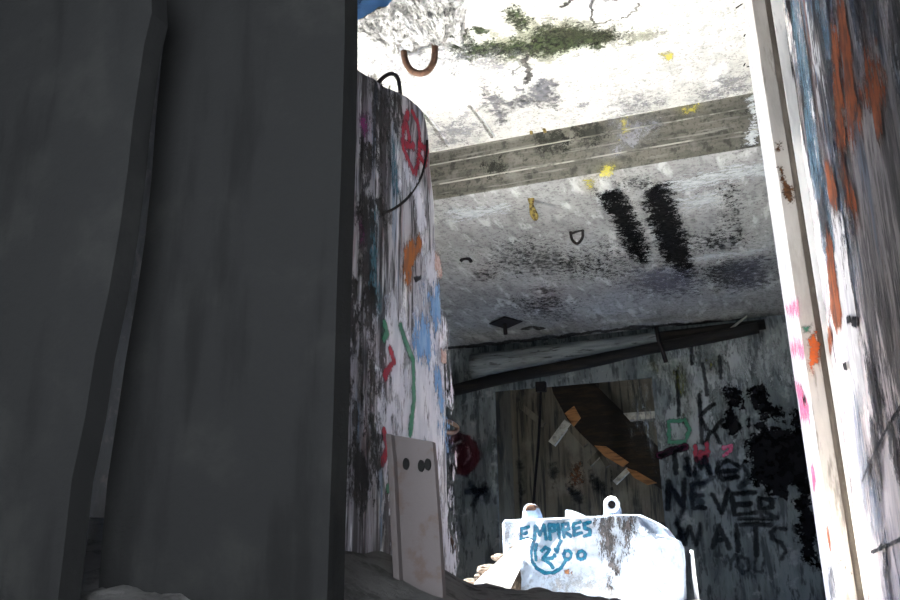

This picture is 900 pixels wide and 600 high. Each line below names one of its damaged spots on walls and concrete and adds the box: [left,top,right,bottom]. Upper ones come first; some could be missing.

spalling [358,0,471,57]
crack [559,0,640,26]
damp [532,93,665,157]
damp [346,8,633,517]